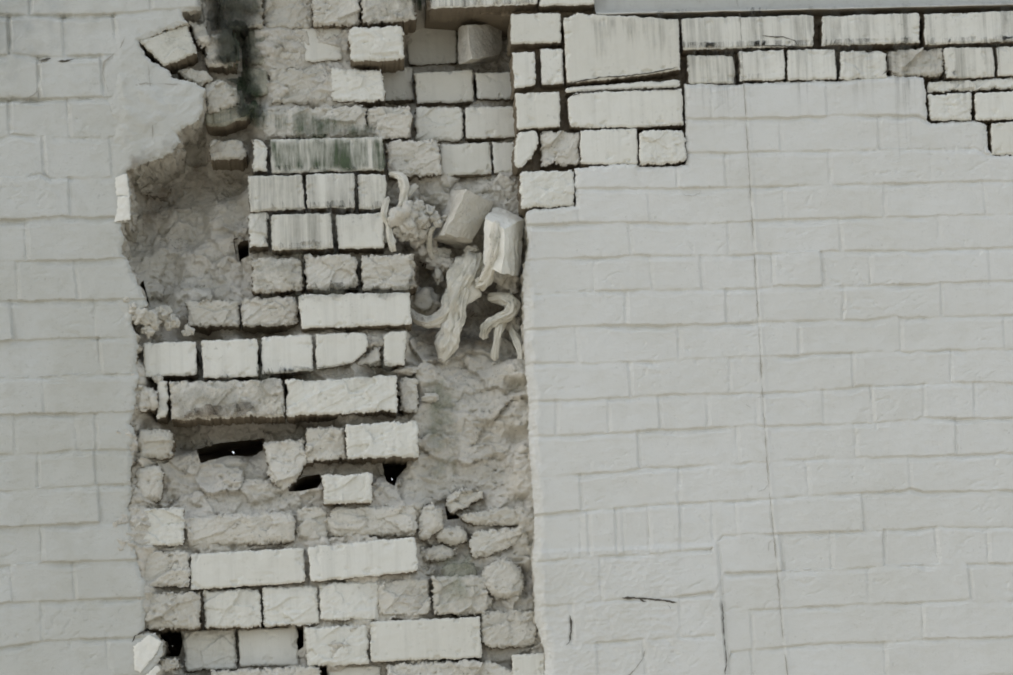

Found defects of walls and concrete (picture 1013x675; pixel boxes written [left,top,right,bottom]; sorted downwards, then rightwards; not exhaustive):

spalling [113,0,545,675]
crack [624,596,676,609]